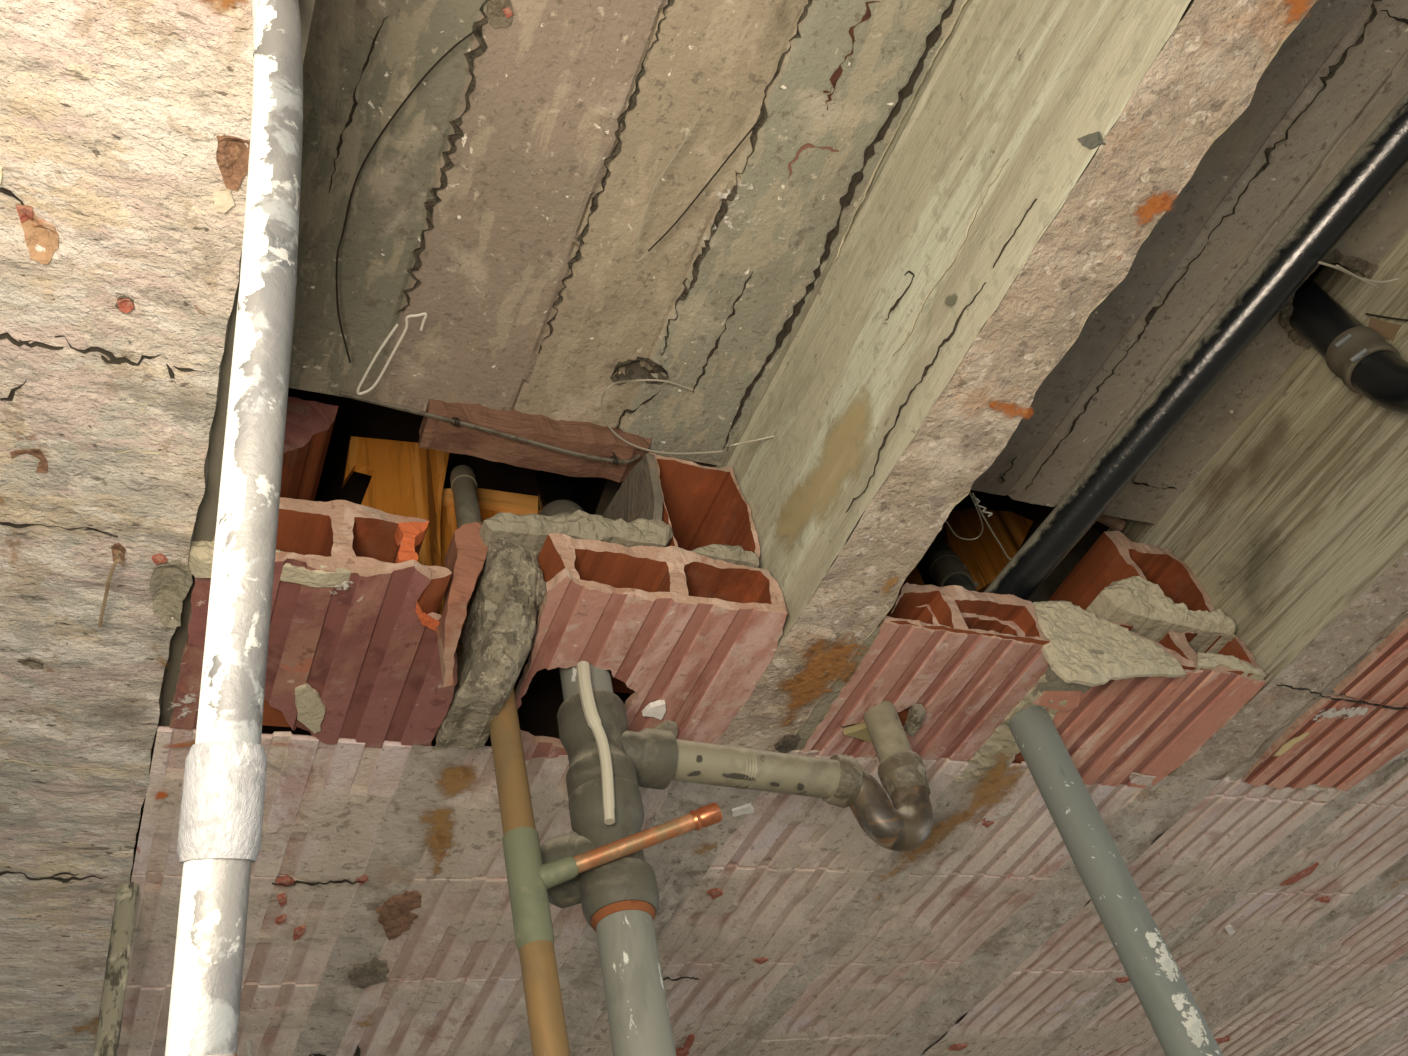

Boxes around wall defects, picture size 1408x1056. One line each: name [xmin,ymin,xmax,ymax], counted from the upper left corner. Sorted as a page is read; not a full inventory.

rust [202,0,245,10]
rust [1286,0,1310,23]
crack [398,0,489,317]
crack [661,0,812,355]
crack [723,0,968,449]
crack [0,332,209,379]
spalling [395,521,429,563]
spalling [149,553,193,628]
spalling [415,601,439,631]
rust [779,633,866,726]
spalling [774,734,800,753]
rust [876,753,1022,900]